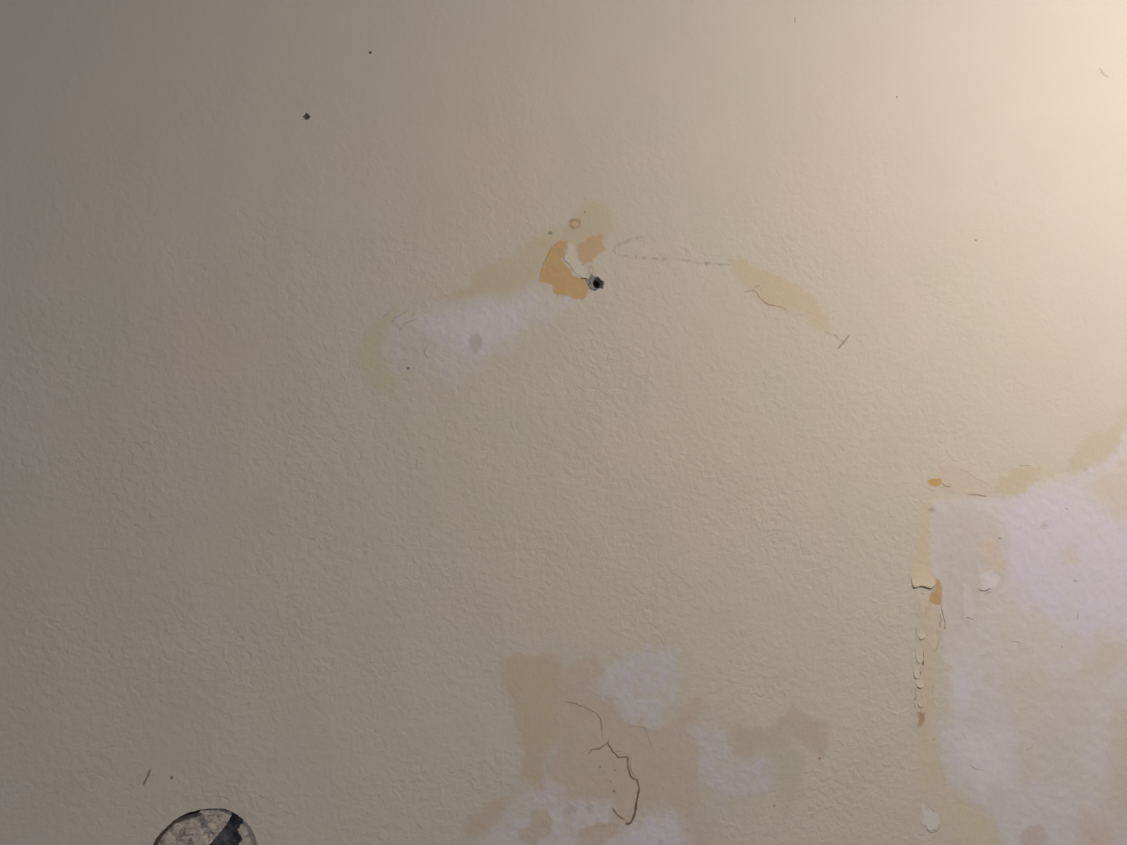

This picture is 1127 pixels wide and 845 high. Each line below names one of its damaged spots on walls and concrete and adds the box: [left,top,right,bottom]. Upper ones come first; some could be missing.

peeling [538,217,607,301]
crack [563,701,654,825]
spalling [153,808,257,845]